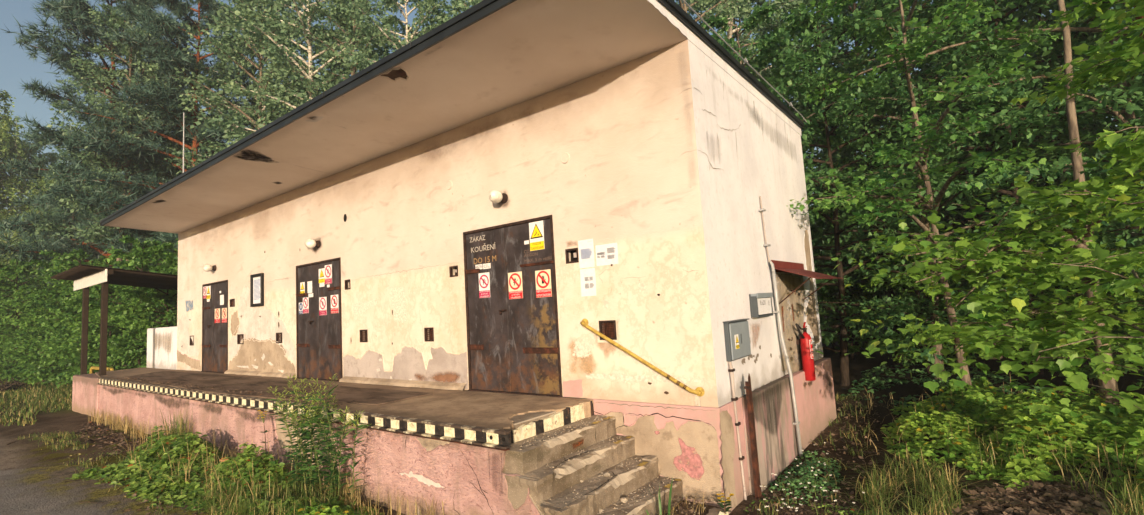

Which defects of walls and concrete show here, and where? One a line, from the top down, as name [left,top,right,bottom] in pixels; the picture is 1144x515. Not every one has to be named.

spalling [378,66,411,82]
peeling [228,284,296,377]
peeling [343,340,468,389]
crack [553,402,715,496]
peeling [604,410,737,510]